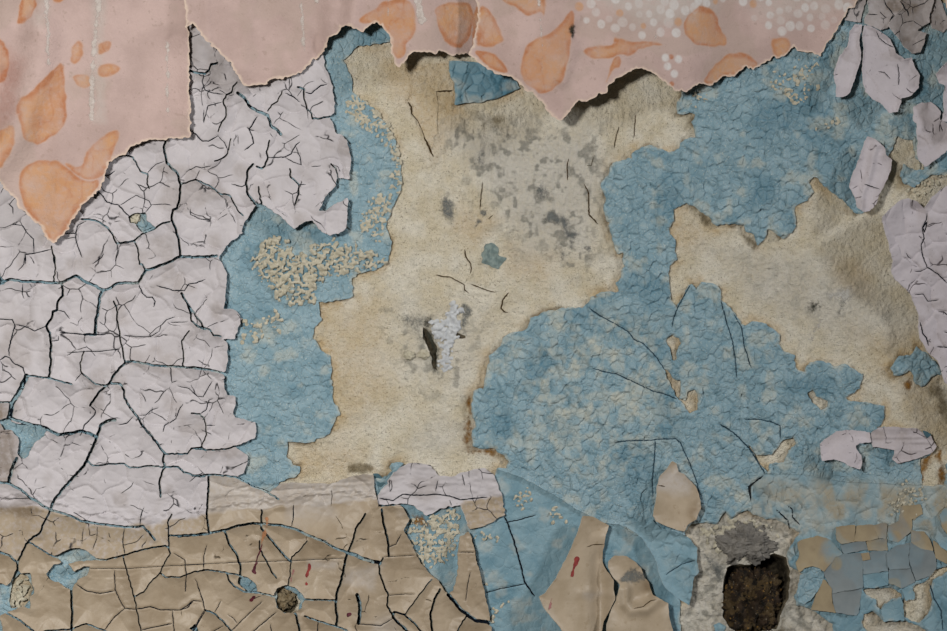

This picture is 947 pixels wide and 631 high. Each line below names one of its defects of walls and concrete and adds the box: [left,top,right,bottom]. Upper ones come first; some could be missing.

peeling [0,22,402,631]
crack [0,24,535,631]
leakage [406,300,471,372]
peeling [373,0,947,631]
crack [906,216,947,348]